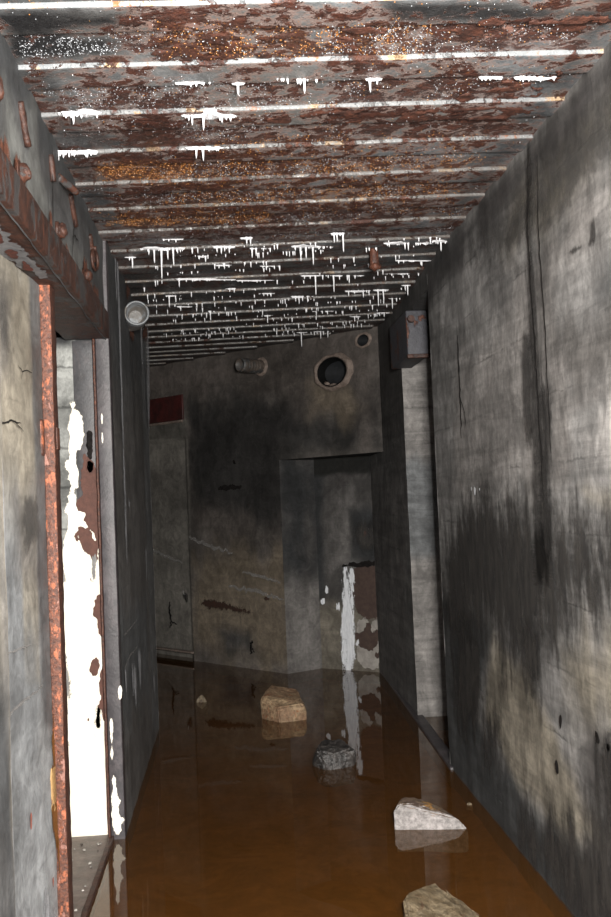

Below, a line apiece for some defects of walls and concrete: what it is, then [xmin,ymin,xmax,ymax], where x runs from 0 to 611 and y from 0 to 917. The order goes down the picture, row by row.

corrosion [151,26,387,62]
corrosion [449,15,611,42]
corrosion [265,71,563,123]
corrosion [0,101,32,171]
damp [443,143,611,760]
peeling [63,402,124,837]
peeling [355,617,379,670]
damp [517,737,611,917]